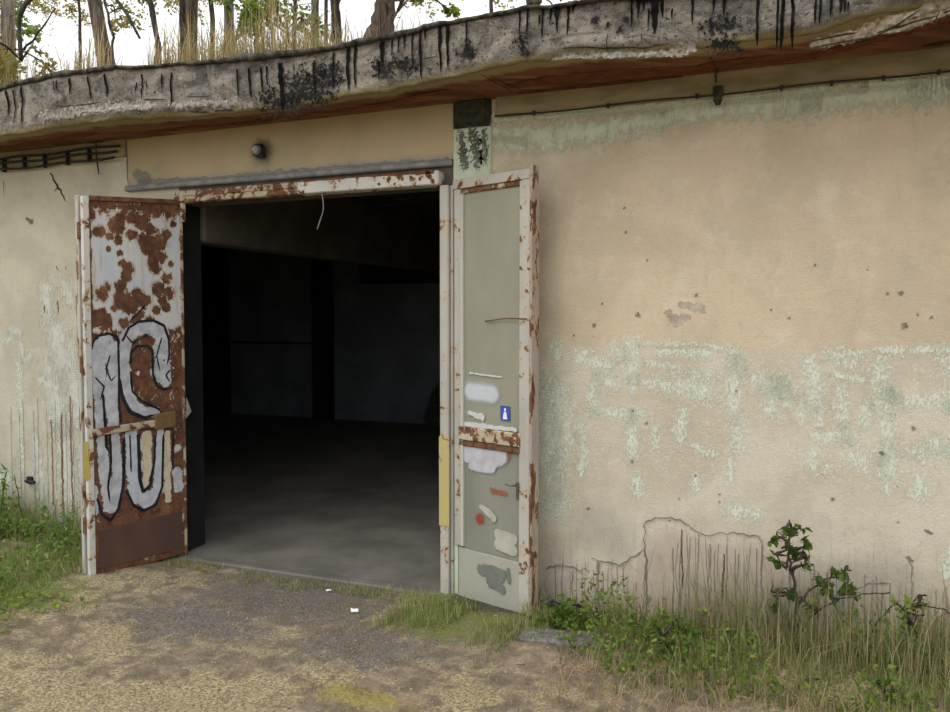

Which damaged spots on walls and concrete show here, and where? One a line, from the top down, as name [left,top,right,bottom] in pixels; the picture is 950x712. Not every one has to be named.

damp [236,66,268,98]
damp [332,45,357,90]
damp [378,29,426,80]
damp [438,24,450,72]
damp [519,1,576,36]
damp [631,0,673,34]
damp [776,0,795,51]
damp [814,0,849,24]
damp [5,86,24,124]
corrosion [298,170,435,186]
corrosion [50,396,74,522]
crack [546,517,761,608]